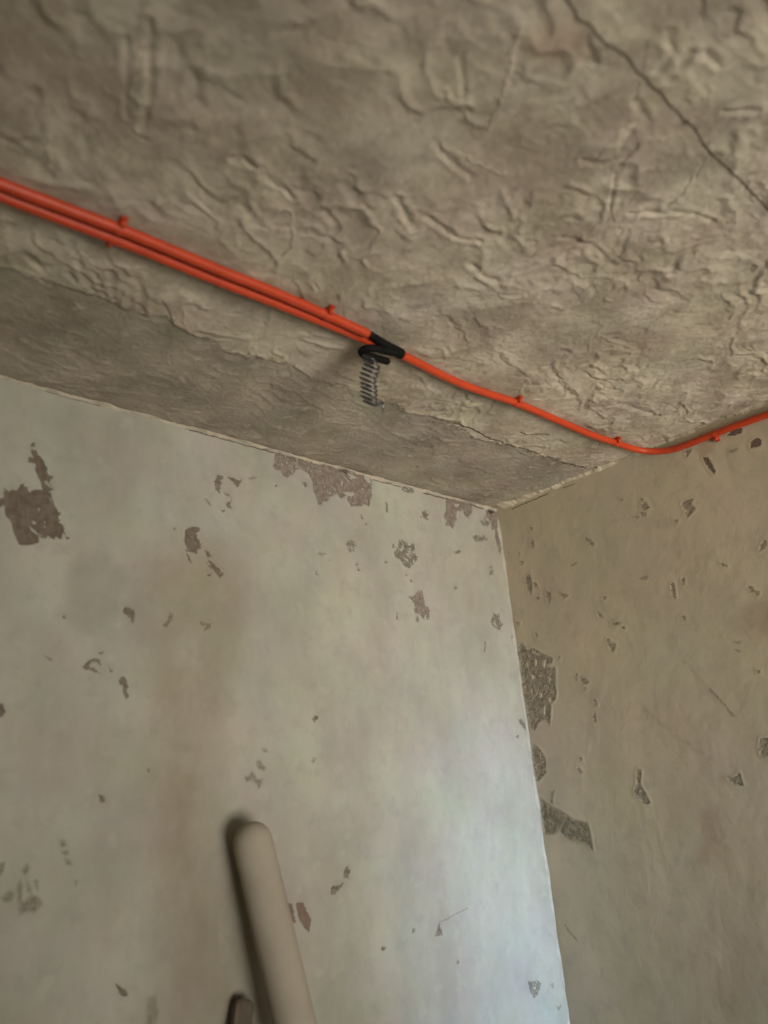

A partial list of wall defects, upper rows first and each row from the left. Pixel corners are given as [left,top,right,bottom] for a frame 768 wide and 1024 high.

crack [565,0,768,222]
peeling [0,267,598,552]
crack [452,422,590,510]
flaking render [174,526,223,577]
flaking render [385,540,430,622]
flaking render [512,622,560,738]
flaking render [634,769,650,805]